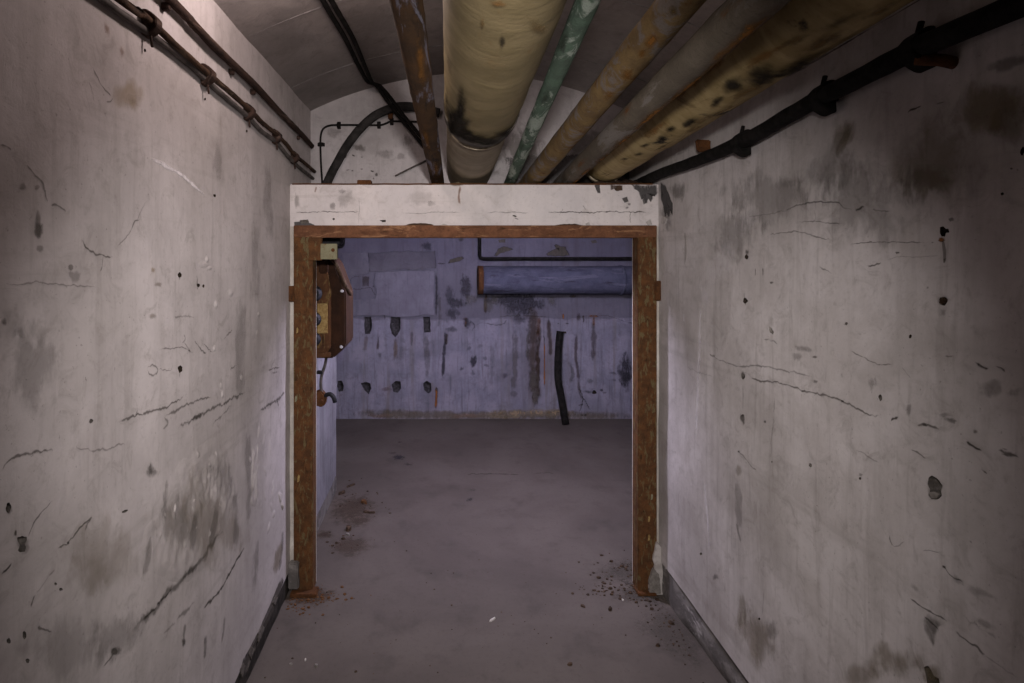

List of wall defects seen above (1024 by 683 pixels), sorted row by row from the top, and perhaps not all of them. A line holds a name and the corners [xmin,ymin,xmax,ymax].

spalling [595,183,673,225]
crack [124,396,238,420]
crack [755,379,936,428]
spalling [928,476,943,499]
crack [205,552,242,607]